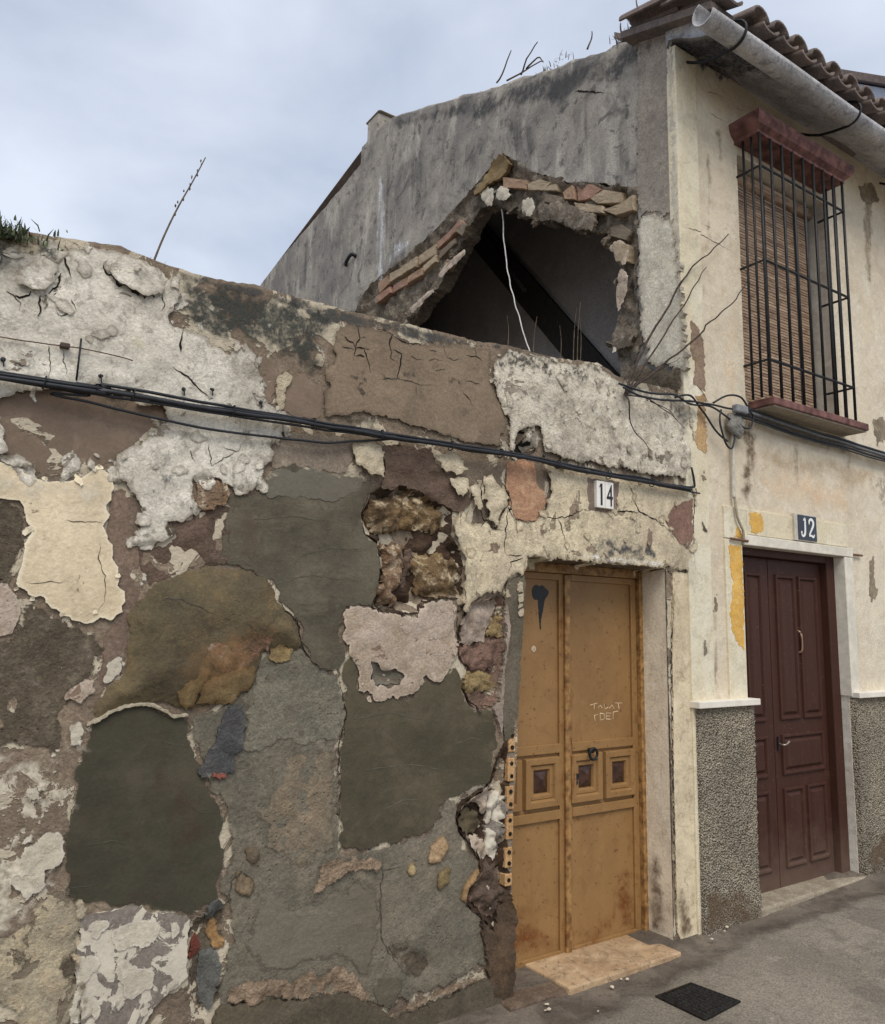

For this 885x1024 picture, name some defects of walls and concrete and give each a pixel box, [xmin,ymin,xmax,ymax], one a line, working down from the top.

damp [423,46,638,118]
crack [7,257,77,316]
crack [103,260,165,310]
damp [180,276,469,371]
crack [341,326,481,402]
peeling [0,34,708,1024]
peeling [712,512,764,650]